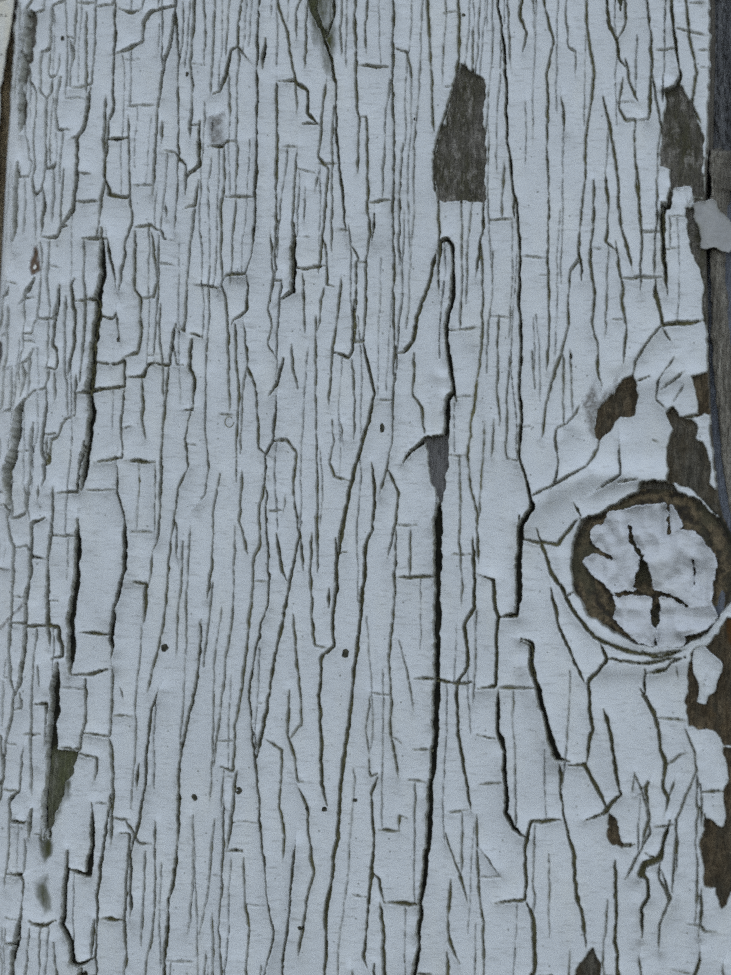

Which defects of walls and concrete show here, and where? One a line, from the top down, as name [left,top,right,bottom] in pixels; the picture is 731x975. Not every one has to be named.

peeling [0,0,19,113]
peeling [433,65,487,204]
peeling [655,0,731,325]
crack [47,0,298,517]
crack [193,0,702,975]
crack [697,495,731,543]
peeling [519,371,731,908]
crack [0,759,49,823]
crack [13,523,191,975]
crack [178,675,199,829]
peeling [576,948,601,975]
crack [696,871,705,931]